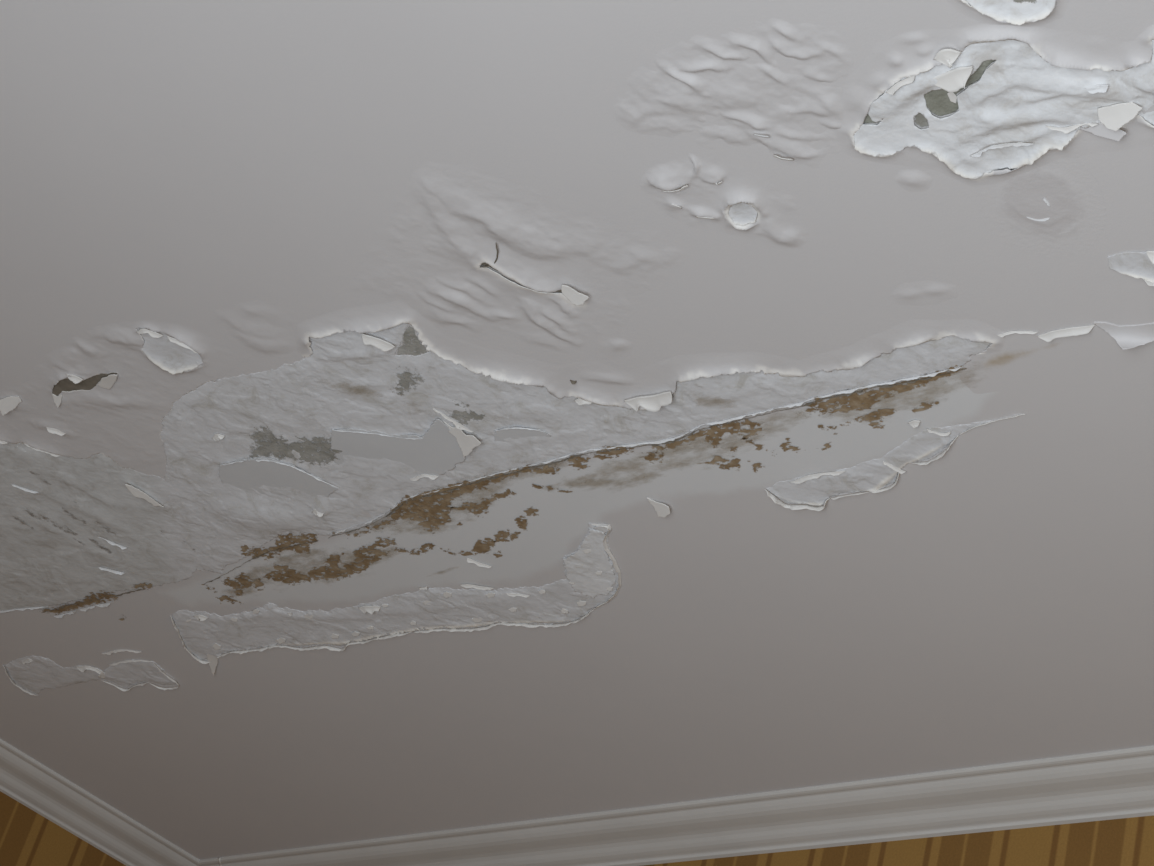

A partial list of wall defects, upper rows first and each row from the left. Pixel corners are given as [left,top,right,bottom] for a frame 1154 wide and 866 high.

peeling [831,0,1154,188]
peeling [1107,251,1154,286]
corrosion [202,419,800,604]
peeling [0,322,1154,618]
corrosion [805,365,967,451]
peeling [3,649,179,696]
peeling [170,523,621,676]